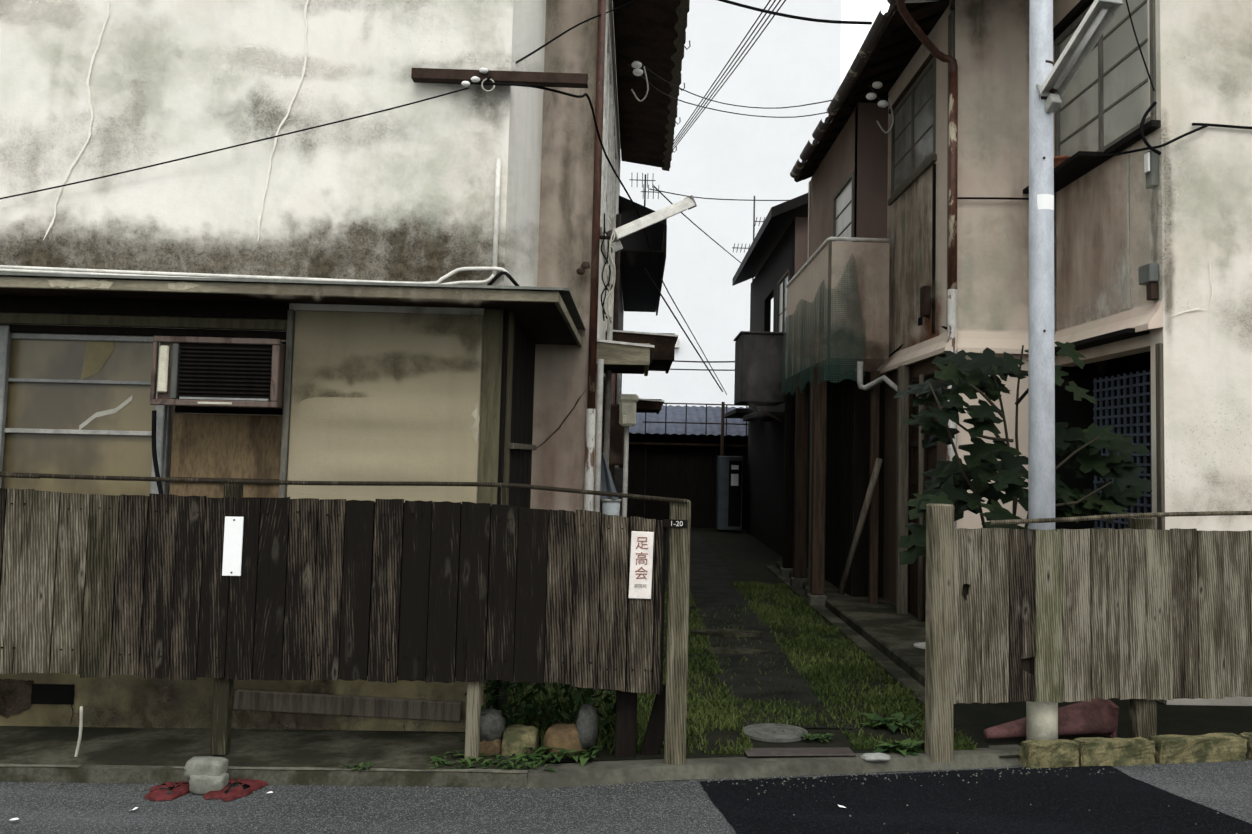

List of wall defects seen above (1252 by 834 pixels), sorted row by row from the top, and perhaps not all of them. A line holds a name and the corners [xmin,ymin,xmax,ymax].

crack [43,0,109,240]
leakage [0,216,516,289]
crack [257,0,309,242]
leakage [813,155,932,362]
corrosion [909,289,940,347]
leakage [1151,134,1172,312]